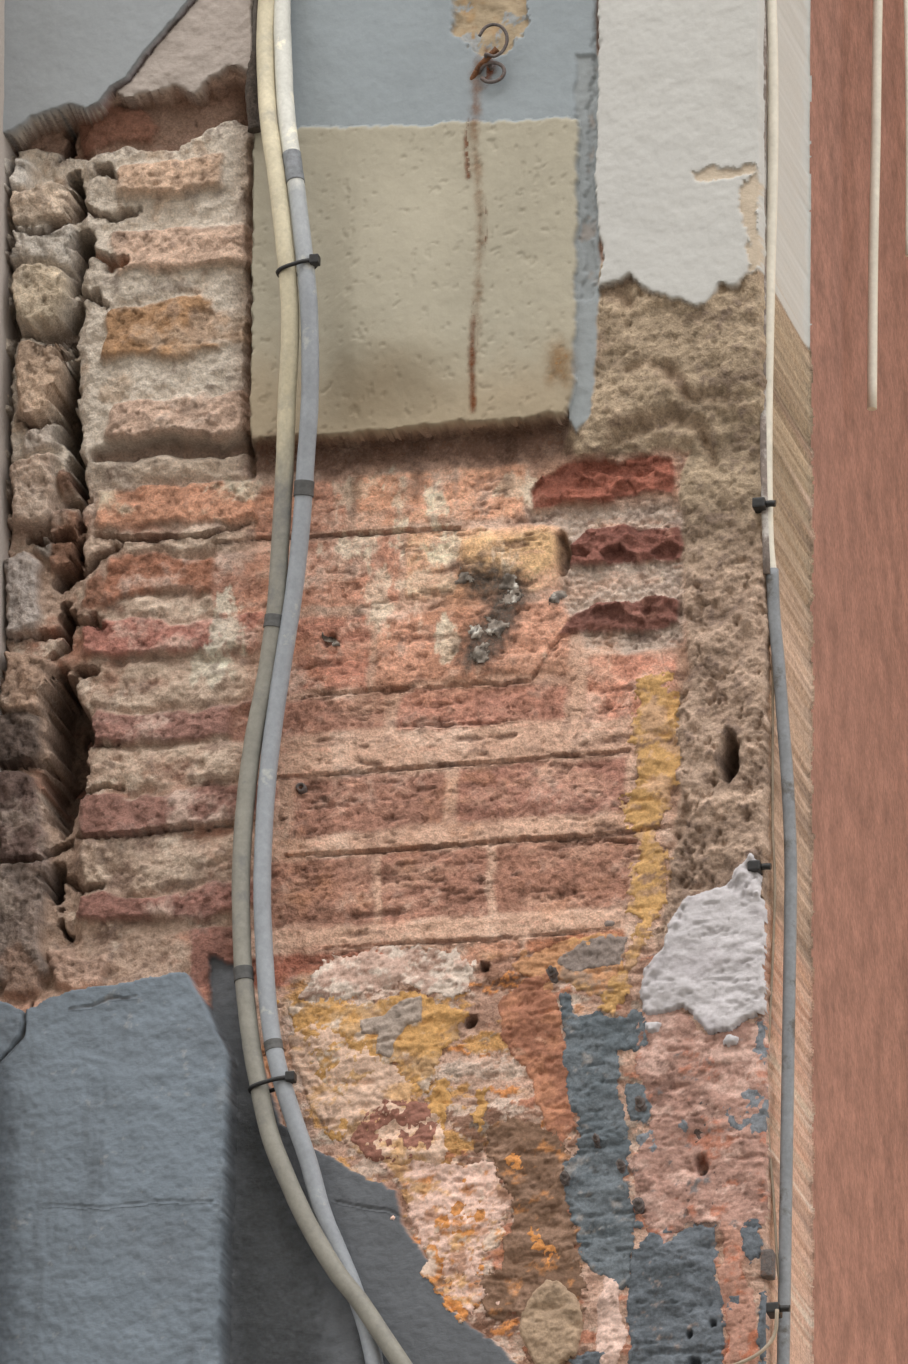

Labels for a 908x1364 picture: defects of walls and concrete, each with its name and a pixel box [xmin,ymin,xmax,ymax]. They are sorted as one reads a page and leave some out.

spalling [0,0,275,1013]
crack [0,0,463,943]
leakage [453,563,528,669]
leakage [549,590,568,605]
crack [305,628,580,730]
crack [188,747,631,787]
spalling [271,161,815,1364]
crack [281,824,672,858]
spalling [250,755,287,1127]